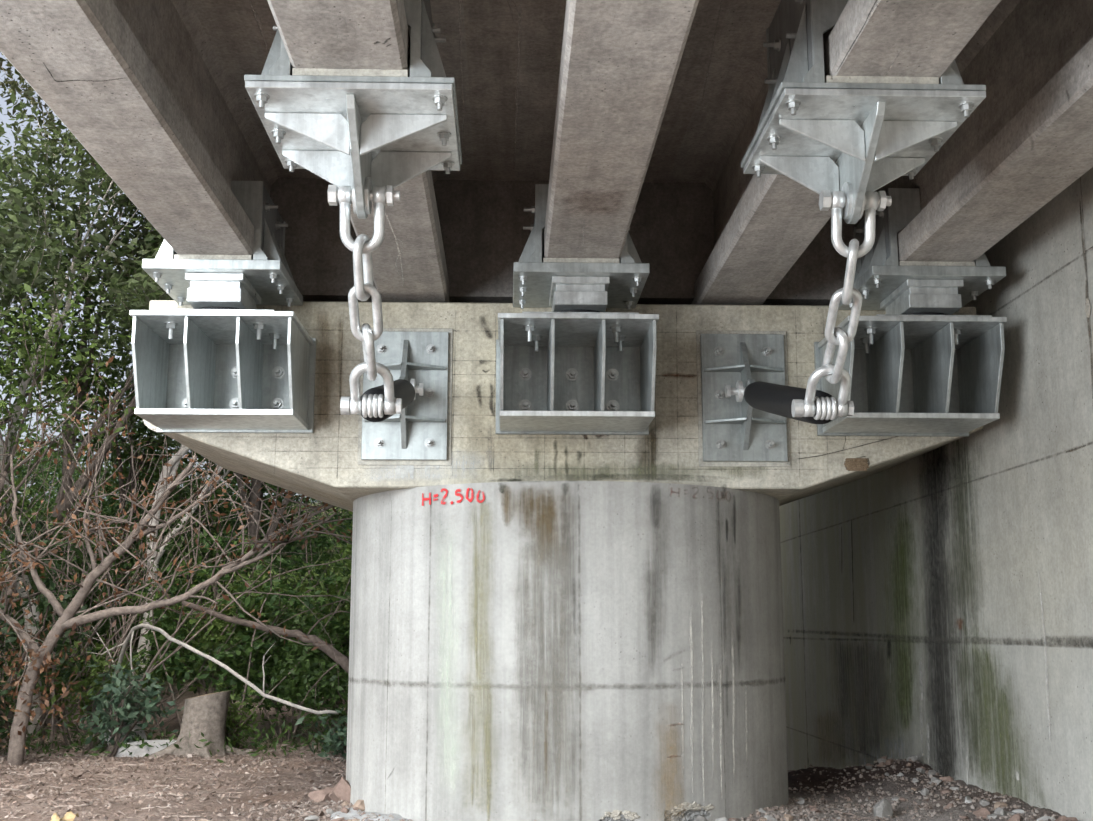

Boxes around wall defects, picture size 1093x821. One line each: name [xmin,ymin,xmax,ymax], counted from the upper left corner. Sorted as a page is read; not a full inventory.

crack [1080,203,1093,401]
leakage [505,491,567,800]
leakage [682,605,747,797]
leakage [854,446,987,777]